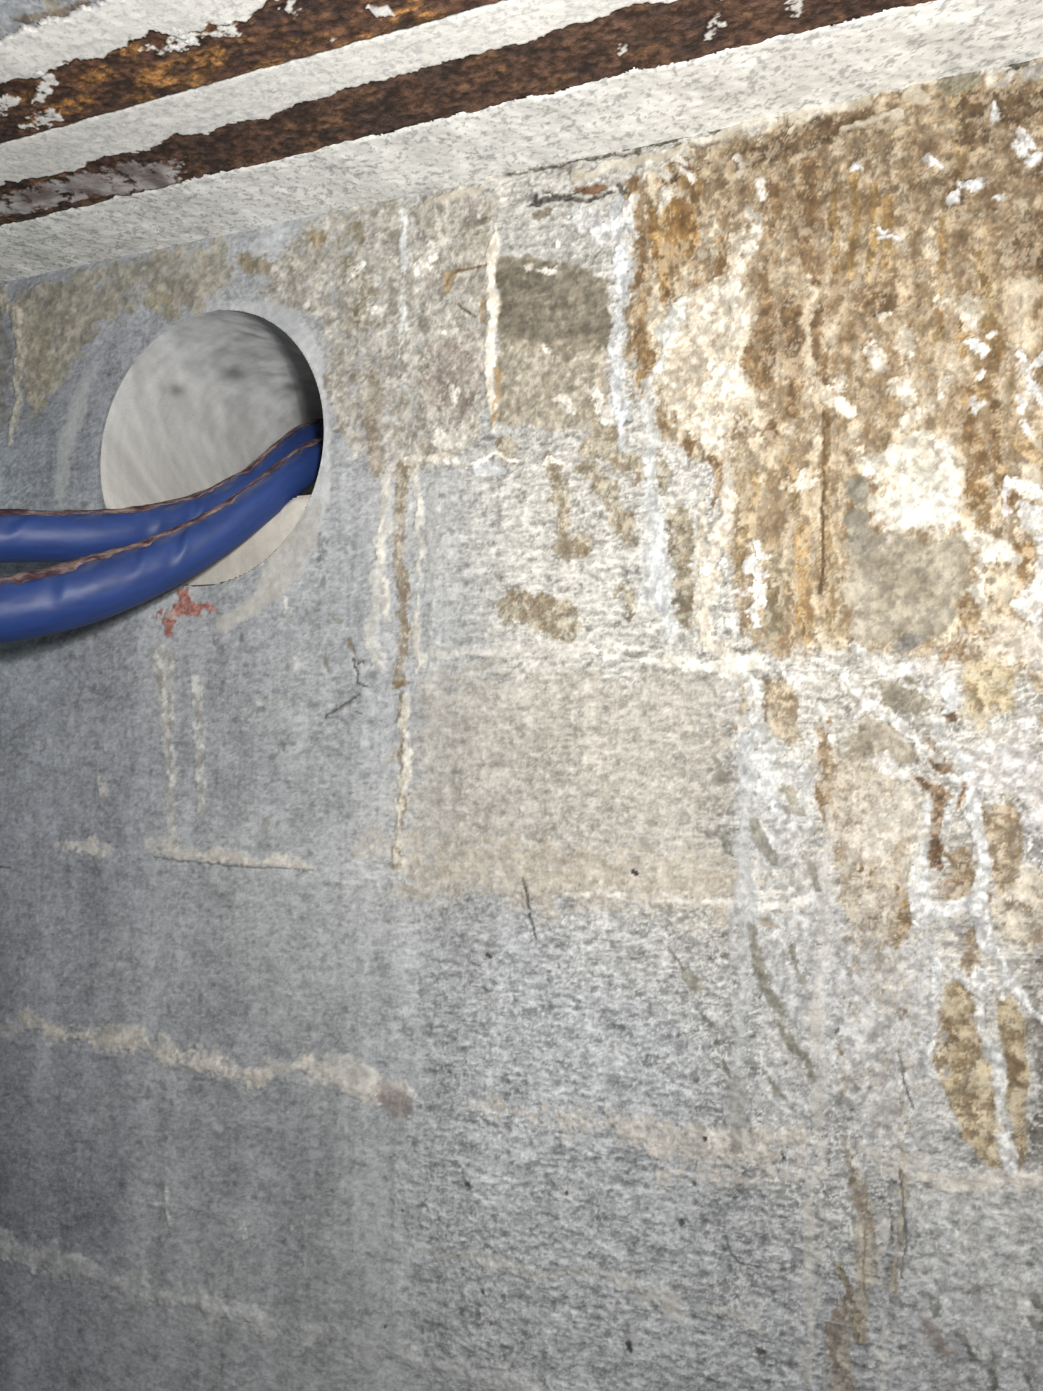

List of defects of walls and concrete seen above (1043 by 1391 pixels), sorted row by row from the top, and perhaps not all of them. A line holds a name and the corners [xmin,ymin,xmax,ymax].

rust [11,0,94,25]
peeling [702,11,728,42]
peeling [783,0,806,18]
spalling [931,60,1043,98]
peeling [0,0,678,220]
leakage [987,98,1043,185]
leakage [0,151,1043,1180]